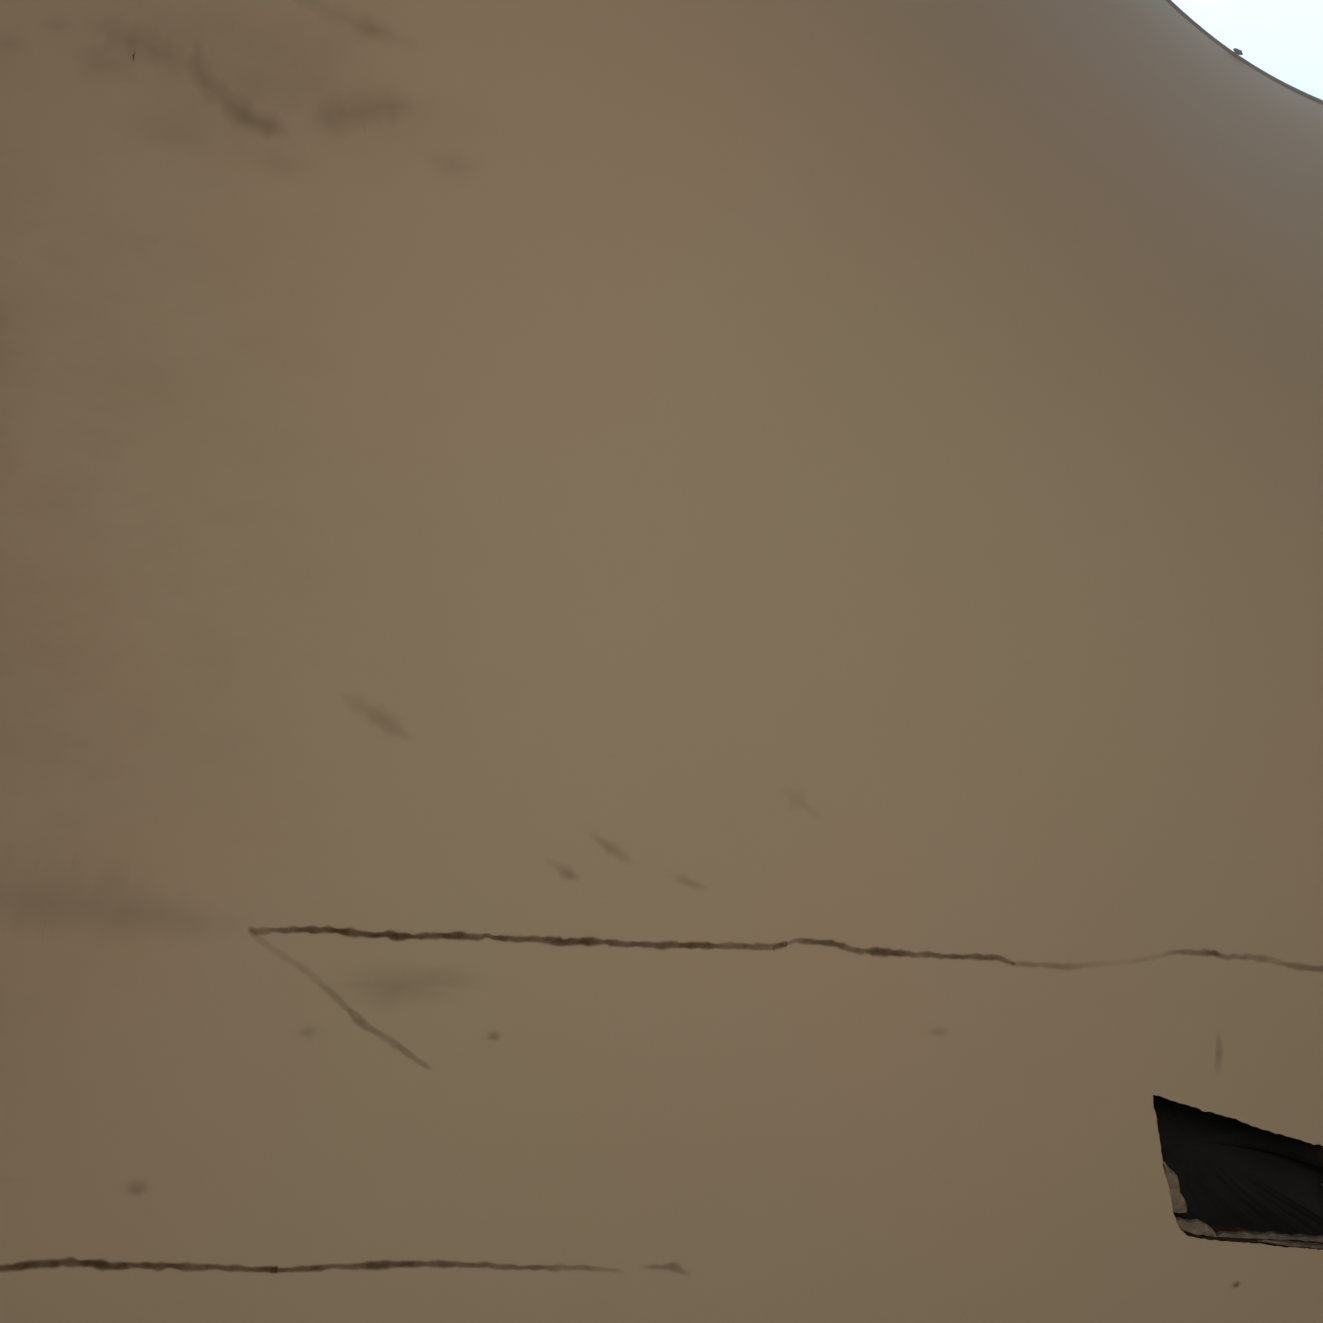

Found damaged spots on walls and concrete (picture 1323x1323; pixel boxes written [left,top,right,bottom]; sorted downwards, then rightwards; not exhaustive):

crack [295,927,747,948]
crack [805,939,993,959]
spalling [1153,1095,1323,1250]
crack [0,1259,474,1272]